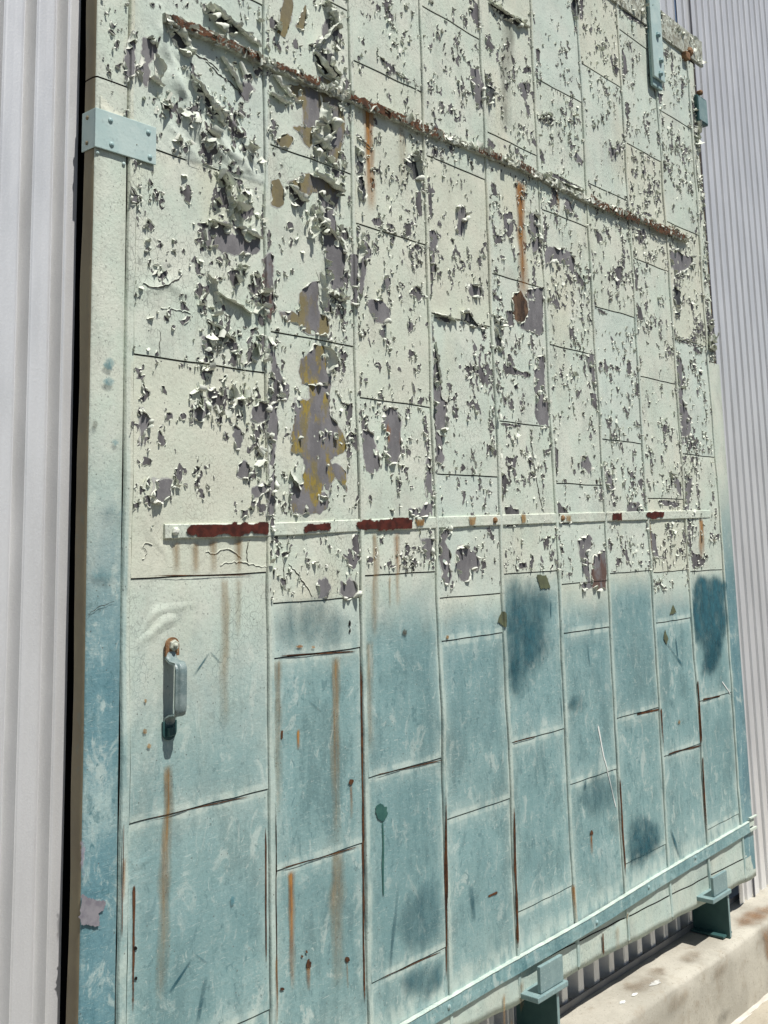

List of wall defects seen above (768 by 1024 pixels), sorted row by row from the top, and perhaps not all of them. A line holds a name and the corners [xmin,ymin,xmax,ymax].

corrosion [172,14,263,62]
corrosion [276,61,321,85]
corrosion [349,94,445,176]
corrosion [591,194,686,239]
peeling [101,0,720,601]
corrosion [187,522,269,551]
corrosion [304,522,331,533]
corrosion [356,517,424,531]
corrosion [265,667,365,997]